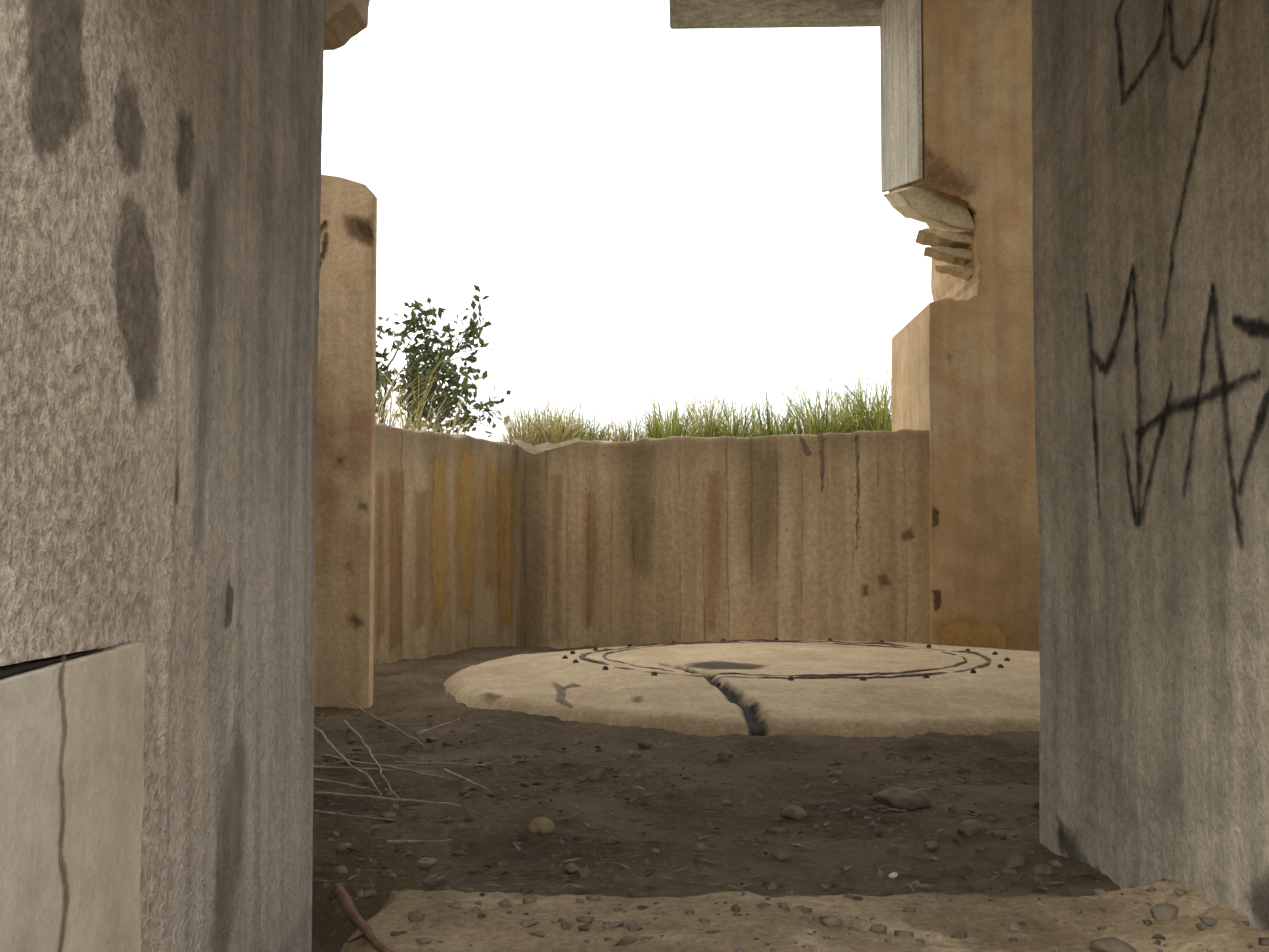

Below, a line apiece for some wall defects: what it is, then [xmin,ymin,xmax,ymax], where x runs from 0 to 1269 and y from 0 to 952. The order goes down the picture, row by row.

damp [29,0,89,154]
damp [114,75,145,172]
damp [177,117,194,194]
damp [115,199,160,404]
crack [675,668,767,736]
crack [0,641,130,952]
damp [1251,876,1269,930]